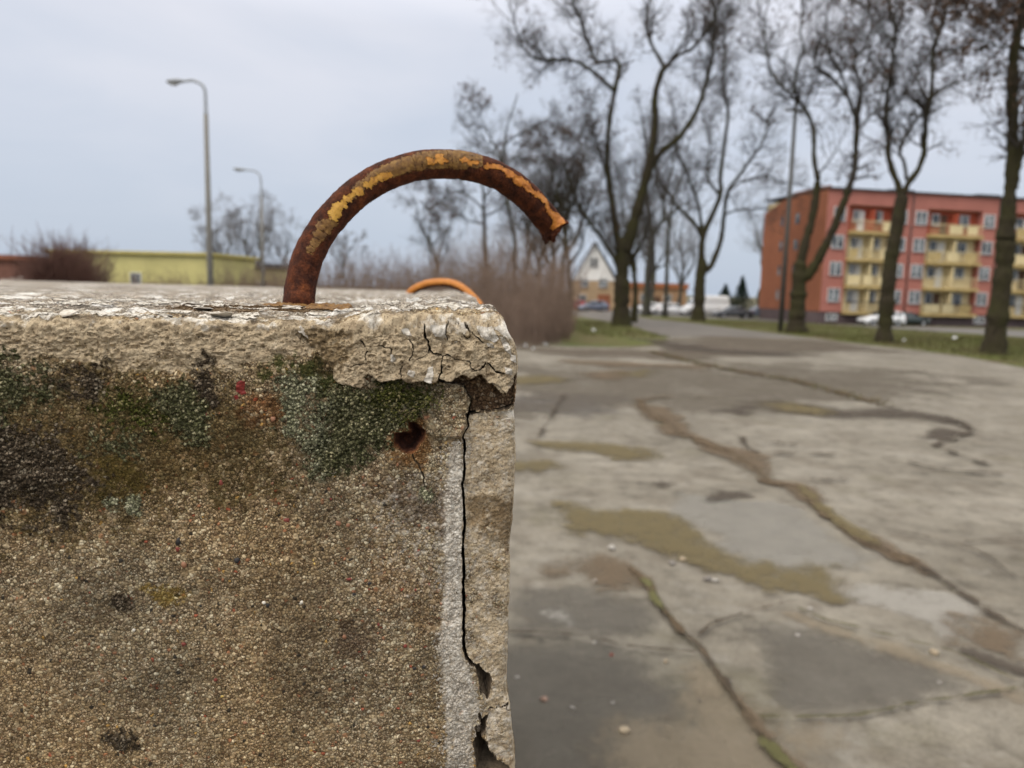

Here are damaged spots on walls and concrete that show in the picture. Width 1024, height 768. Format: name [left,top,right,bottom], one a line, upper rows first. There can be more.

spalling [452,325,517,411]
crack [651,351,1001,473]
crack [348,324,514,699]
crack [633,396,1024,631]
crack [508,565,1024,741]